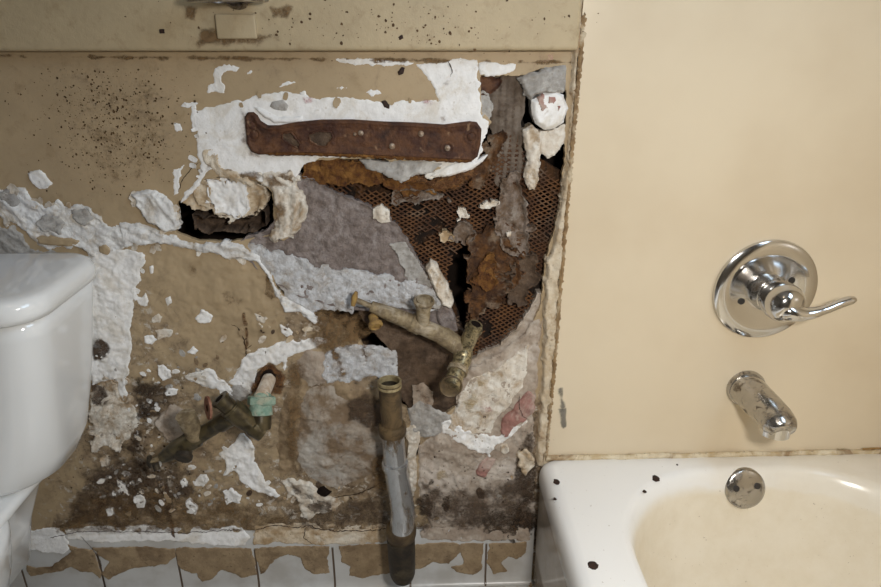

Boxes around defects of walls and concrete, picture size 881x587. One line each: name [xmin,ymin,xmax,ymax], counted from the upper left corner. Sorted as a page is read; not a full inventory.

mould [4,69,207,200]
rust [301,130,508,197]
flaking render [516,65,568,190]
peeling [0,58,543,582]
rust [463,222,526,323]
damp [55,376,291,534]
damp [286,364,303,471]
damp [293,486,388,530]
damp [348,393,381,427]
damp [371,455,387,491]
damp [415,432,537,543]